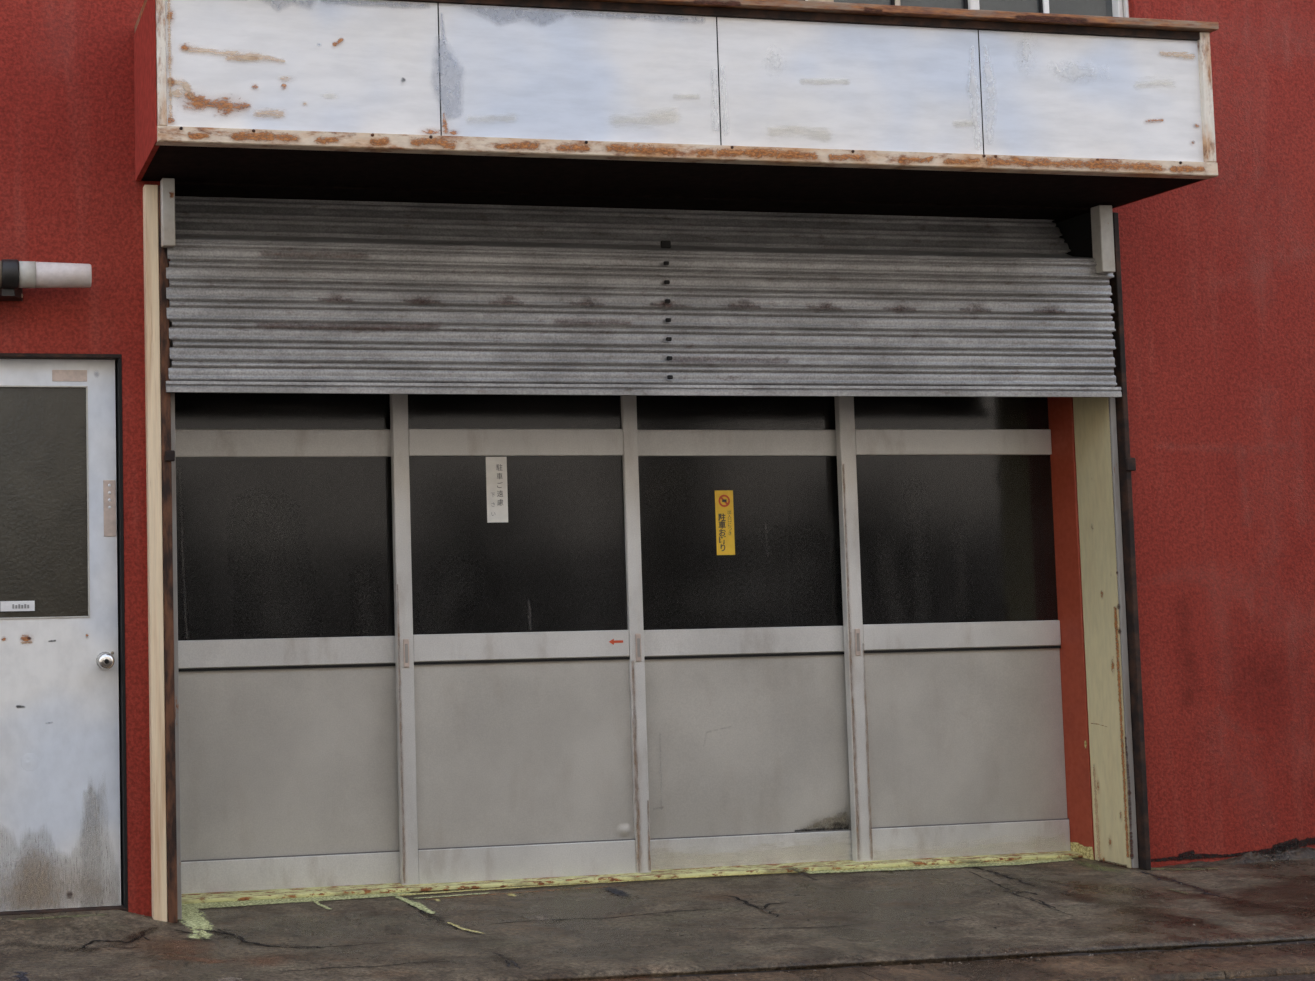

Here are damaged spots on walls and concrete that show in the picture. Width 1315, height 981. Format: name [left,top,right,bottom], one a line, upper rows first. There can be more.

corrosion [167,0,285,123]
corrosion [231,131,298,141]
corrosion [370,137,389,145]
corrosion [411,113,457,150]
corrosion [495,142,539,150]
corrosion [606,143,677,156]
corrosion [697,147,865,161]
corrosion [898,156,1205,172]
crack [971,867,1073,916]
crack [408,894,865,969]
crack [75,927,445,972]